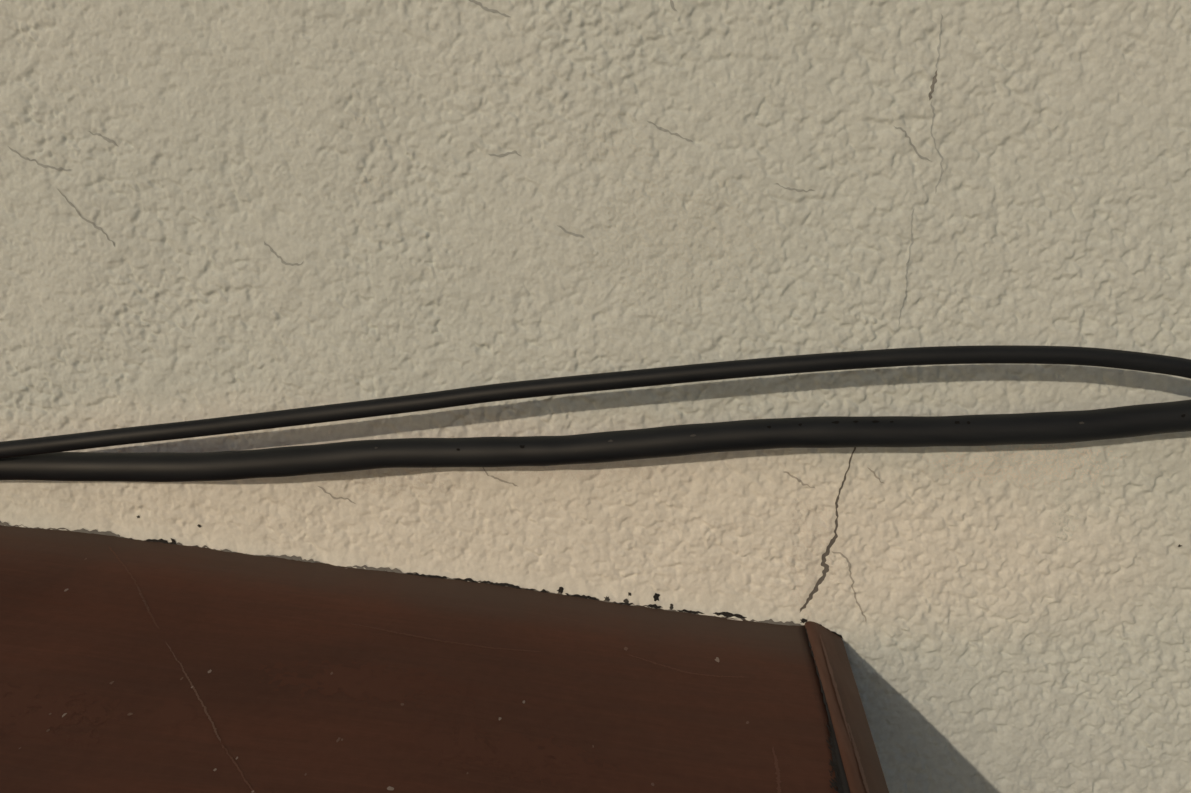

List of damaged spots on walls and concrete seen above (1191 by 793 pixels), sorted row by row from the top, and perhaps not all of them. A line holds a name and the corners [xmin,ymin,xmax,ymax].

crack [784,447,884,621]